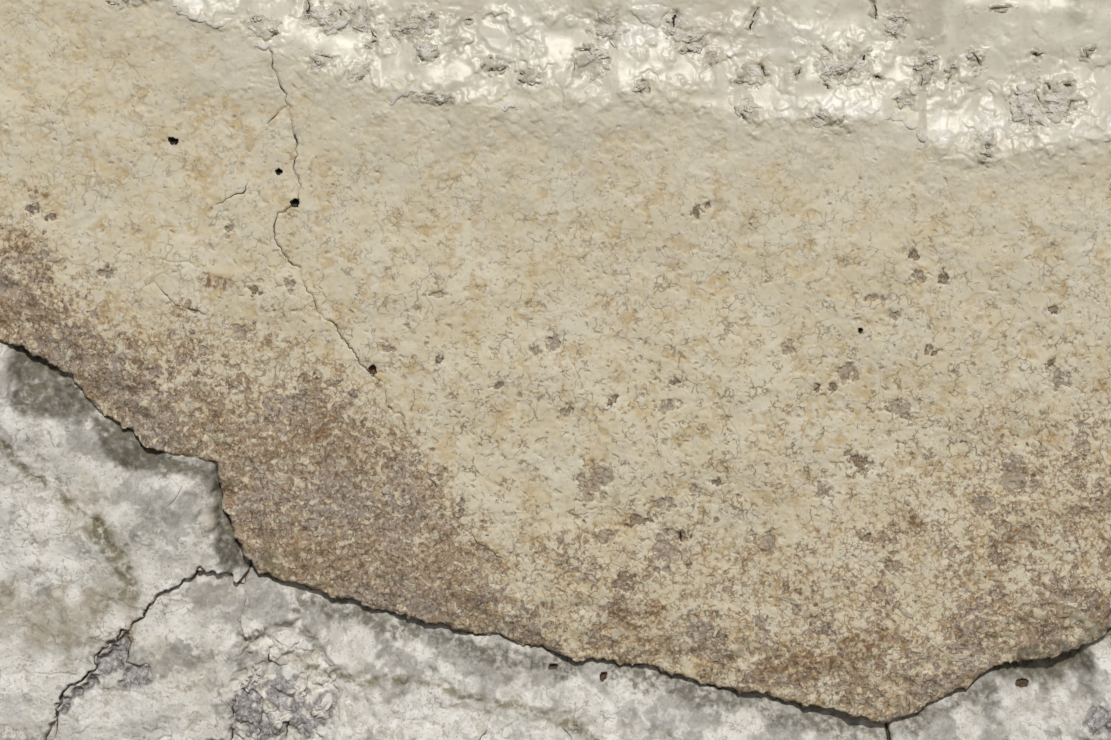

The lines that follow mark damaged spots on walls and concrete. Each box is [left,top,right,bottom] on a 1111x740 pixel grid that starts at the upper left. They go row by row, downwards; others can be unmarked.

crack [267,52,405,428]
spalling [0,202,1111,724]
crack [49,564,399,740]
crack [424,623,555,652]
spalling [211,662,337,740]
crack [707,684,891,740]
spalling [1082,704,1111,736]